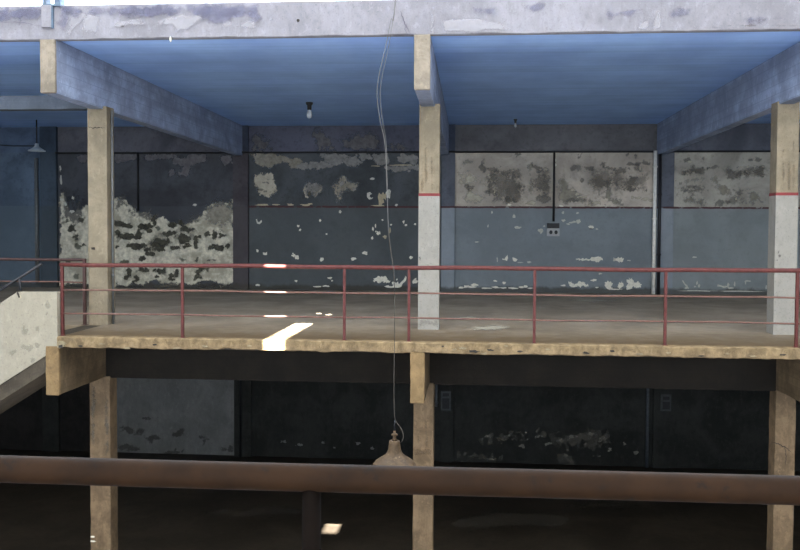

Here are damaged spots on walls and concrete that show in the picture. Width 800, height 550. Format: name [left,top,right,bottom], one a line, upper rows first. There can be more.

peeling [114,151,207,177]
peeling [250,151,419,172]
damp [679,158,764,206]
peeling [367,190,398,206]
peeling [59,166,95,287]
peeling [114,197,233,289]
peeling [373,276,418,288]
peeling [459,280,532,289]
peeling [561,273,642,290]